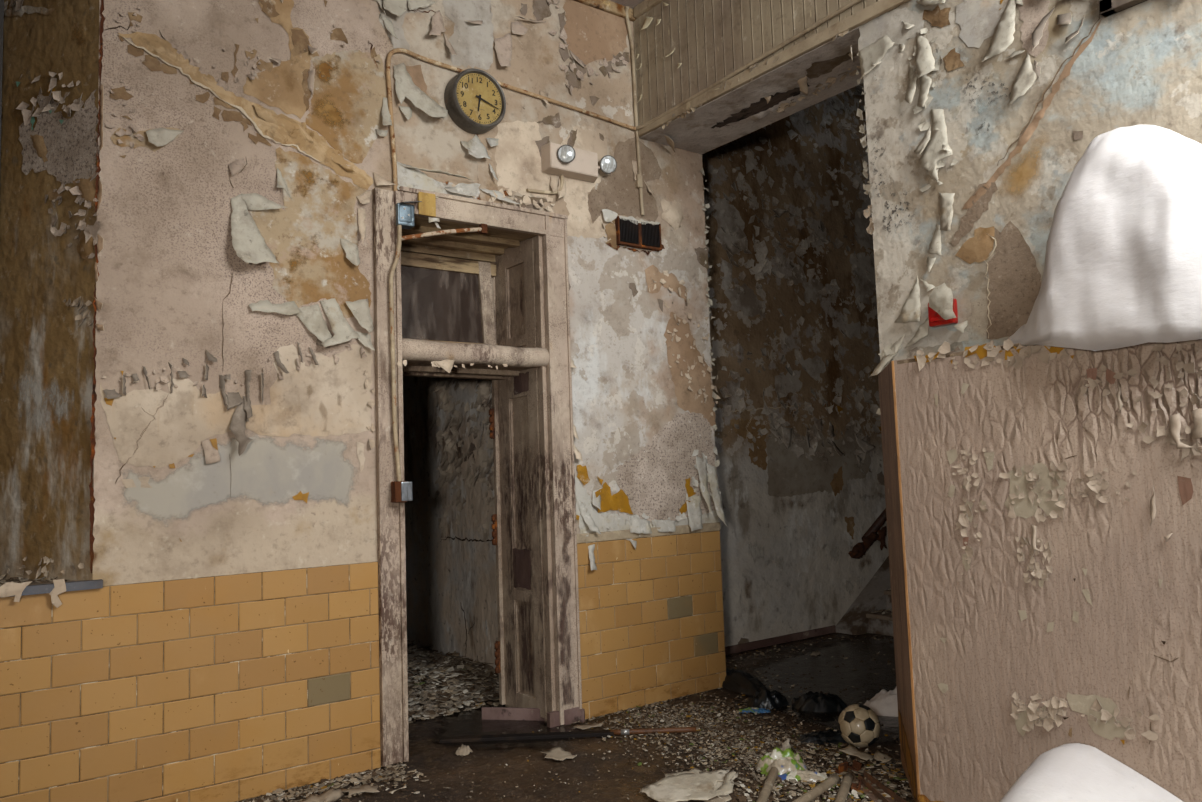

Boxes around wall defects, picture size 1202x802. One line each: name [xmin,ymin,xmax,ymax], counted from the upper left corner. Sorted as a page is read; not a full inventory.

peeling [16,72,184,263]
crack [115,395,168,484]
peeling [100,0,1085,705]
peeling [946,448,1137,588]
peeling [1080,340,1202,461]
peeling [1177,476,1193,505]
peeling [1010,692,1161,744]